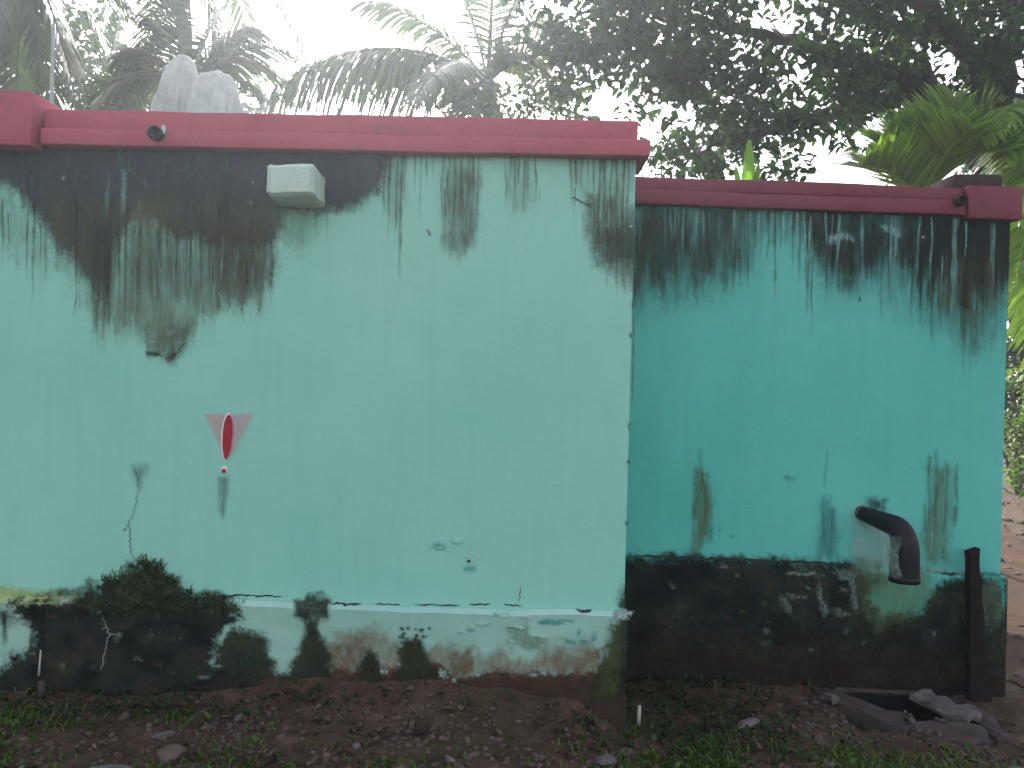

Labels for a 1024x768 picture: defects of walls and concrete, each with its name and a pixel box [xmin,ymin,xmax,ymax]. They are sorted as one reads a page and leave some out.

water stain [0,146,401,344]
water stain [587,191,745,292]
water stain [757,211,1010,309]
crack [123,471,139,562]
corrosion [695,471,711,548]
water stain [624,549,965,697]
water stain [981,577,1008,697]